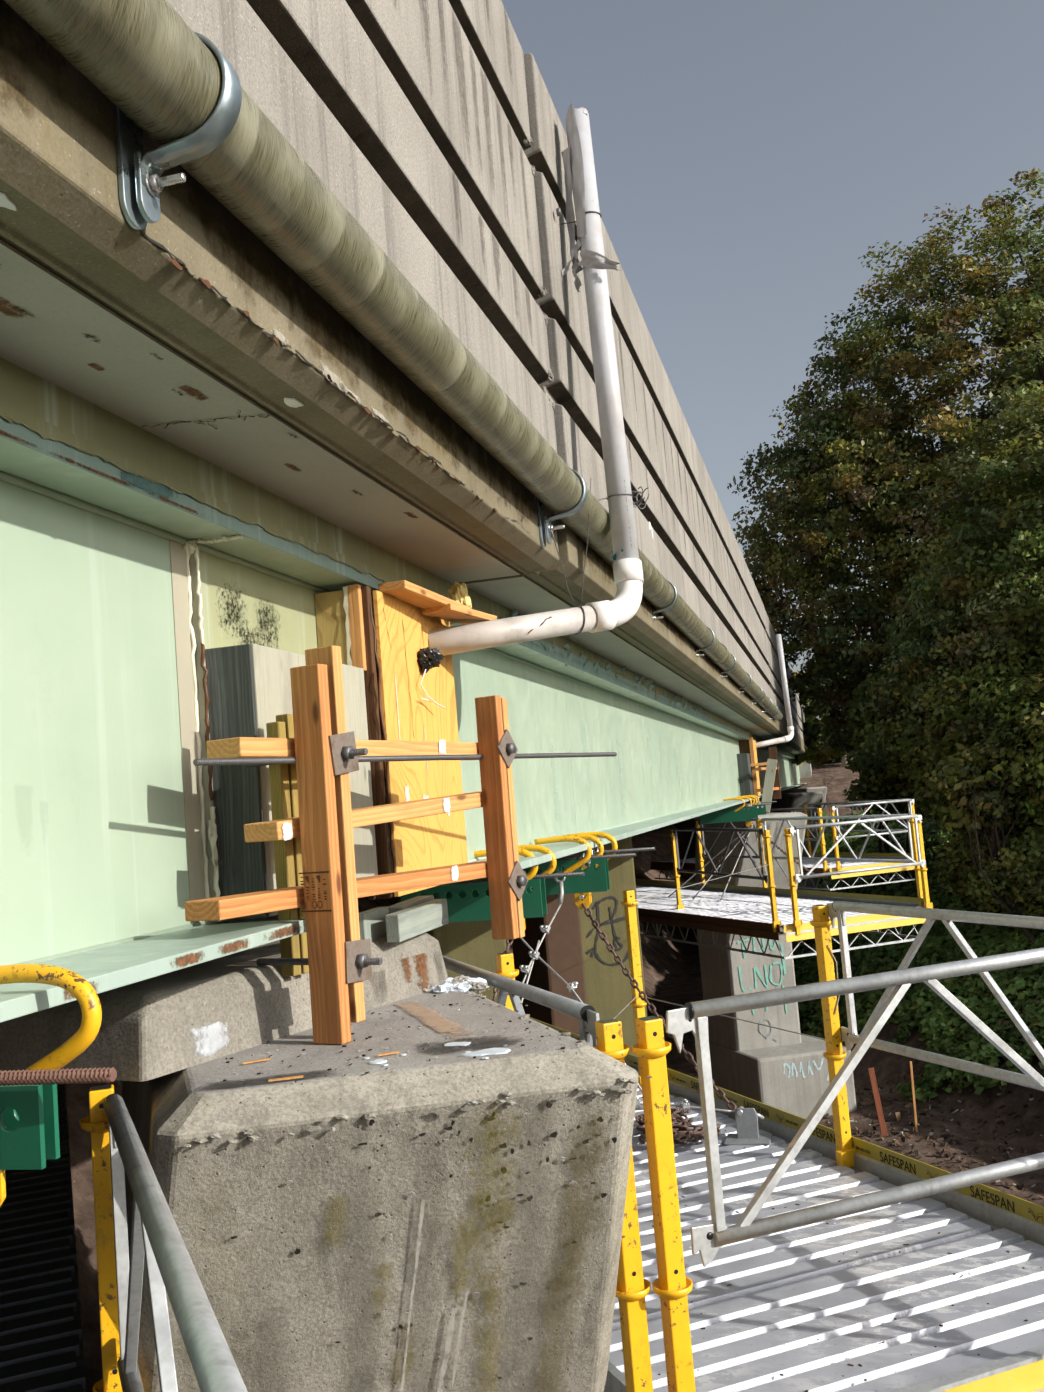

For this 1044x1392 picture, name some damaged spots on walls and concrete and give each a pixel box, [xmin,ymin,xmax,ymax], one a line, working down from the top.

corrosion [0,297,29,317]
corrosion [175,386,207,400]
peeling [0,401,400,582]
corrosion [265,925,300,940]
corrosion [176,939,248,967]
leakage [400,1199,425,1392]
leakage [437,1290,469,1392]